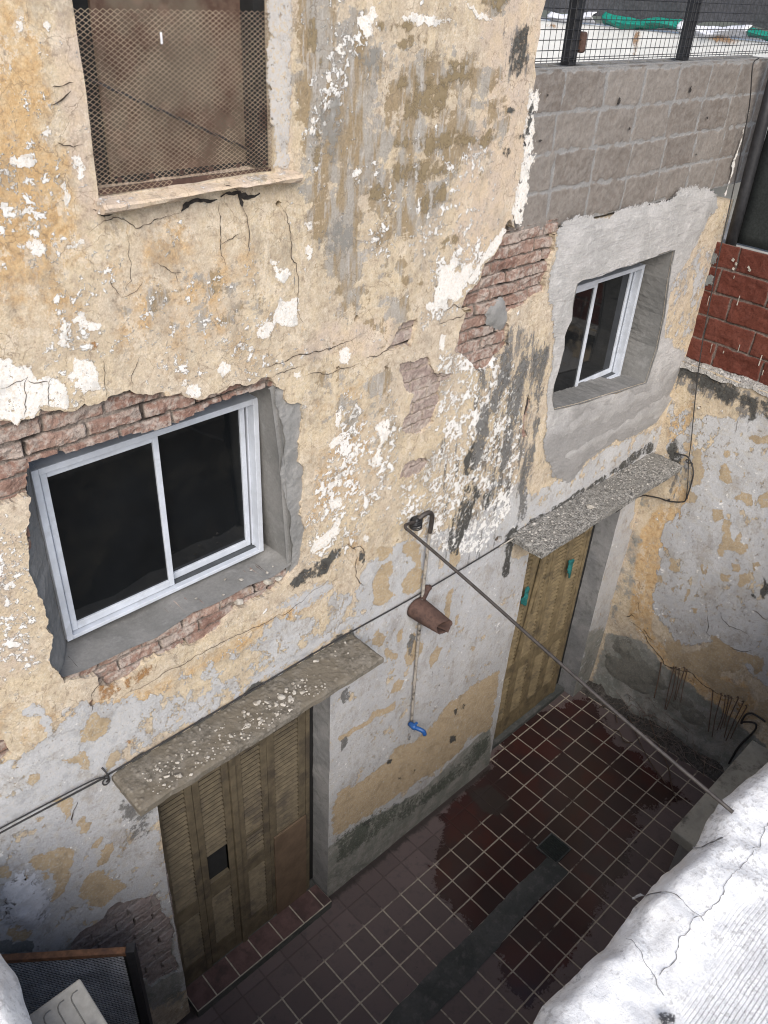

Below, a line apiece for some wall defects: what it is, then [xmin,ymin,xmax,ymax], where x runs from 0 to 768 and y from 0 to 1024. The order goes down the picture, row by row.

peeling [357,5,378,40]
crack [90,185,304,323]
spalling [425,88,558,369]
spalling [0,312,281,500]
crack [269,337,389,376]
spalling [369,357,451,467]
water stain [448,347,549,555]
water stain [678,369,768,420]
spalling [60,563,286,684]
rust [708,690,747,741]
spalling [0,693,182,986]
crack [629,823,768,995]